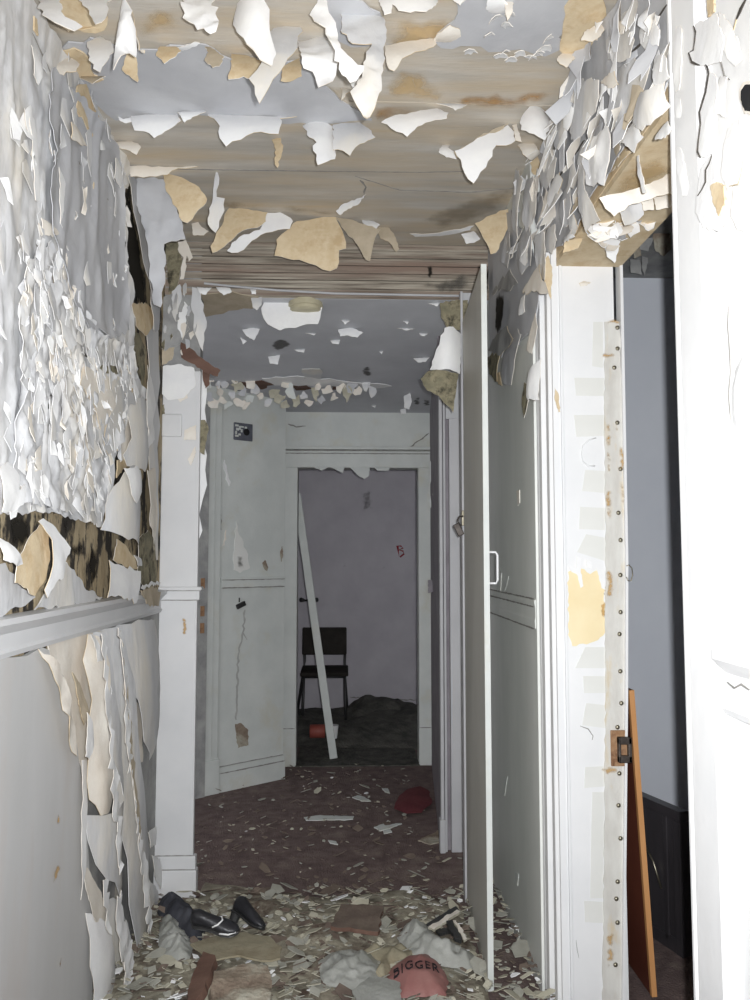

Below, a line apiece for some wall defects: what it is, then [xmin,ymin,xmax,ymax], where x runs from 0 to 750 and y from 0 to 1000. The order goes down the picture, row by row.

peeling [0,0,747,617]
peeling [38,619,217,1000]
crack [235,610,247,720]
spalling [235,723,249,748]
peeling [176,763,556,1000]
spalling [567,556,606,646]